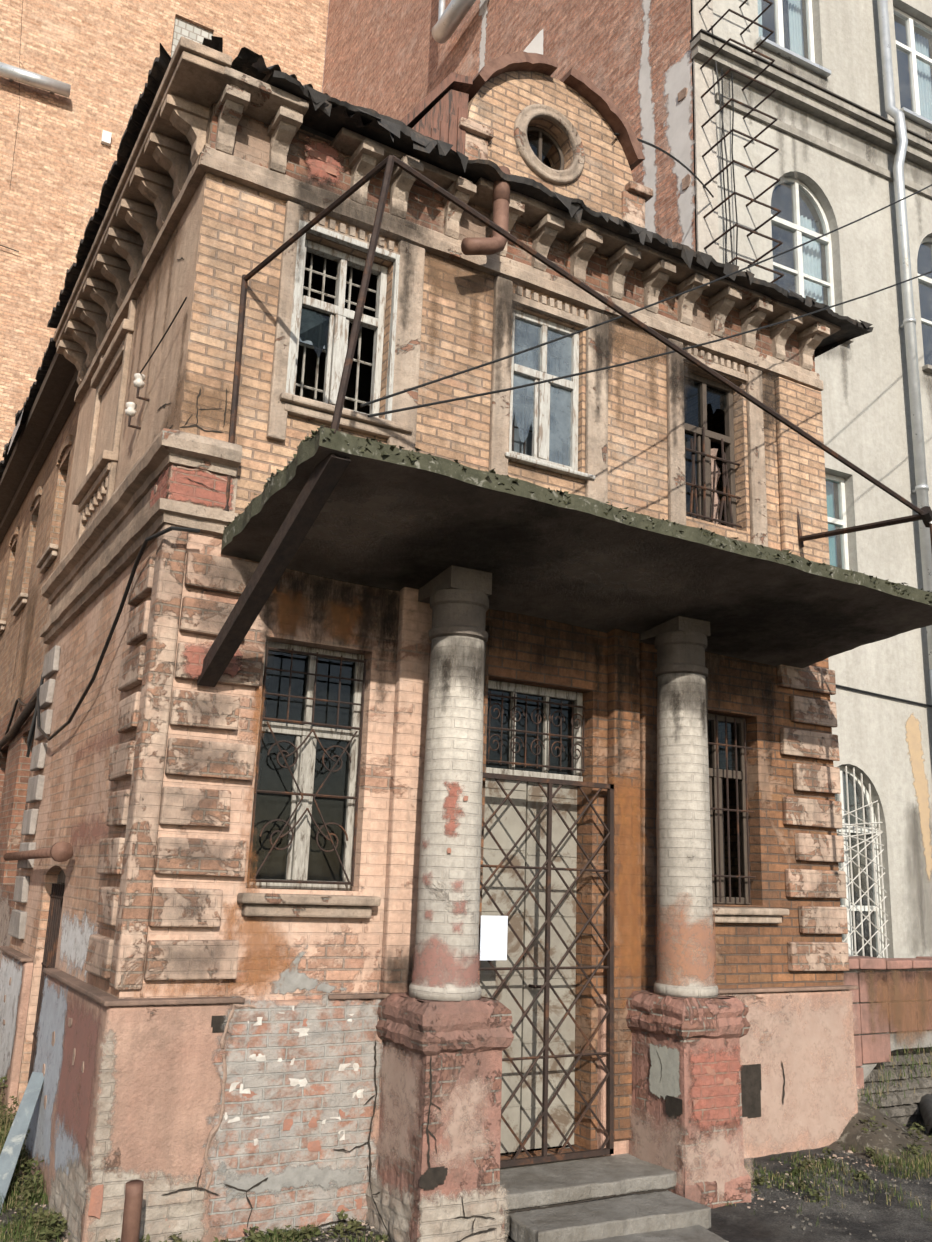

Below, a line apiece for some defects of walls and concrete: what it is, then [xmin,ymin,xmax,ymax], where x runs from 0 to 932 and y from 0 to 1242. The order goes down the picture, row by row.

spalling [663,50,695,249]
damp [397,523,536,586]
peeling [443,782,468,853]
peeling [0,884,22,1083]
flaking render [23,909,509,1242]
peeling [629,999,858,1194]